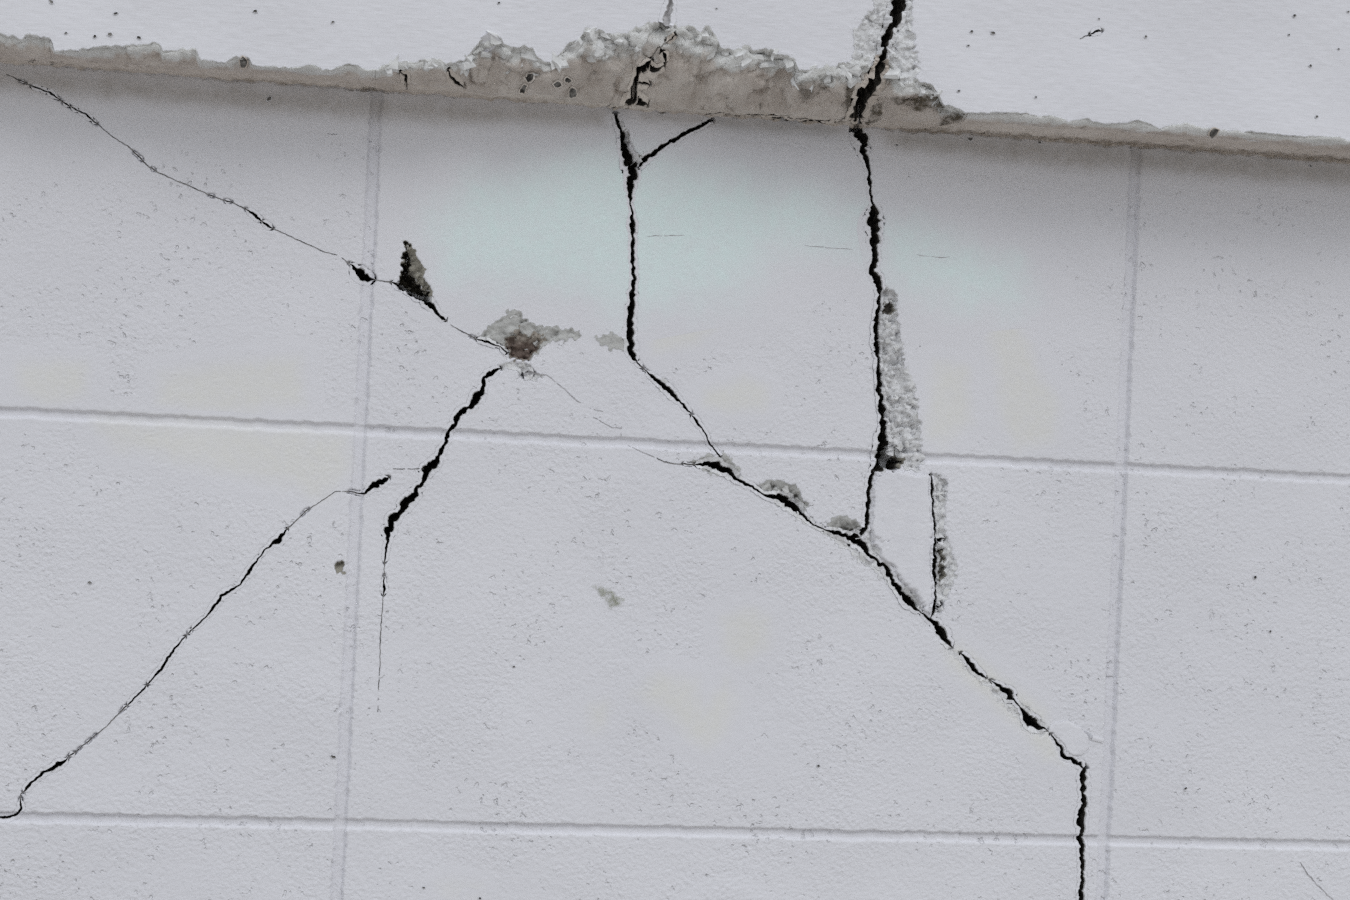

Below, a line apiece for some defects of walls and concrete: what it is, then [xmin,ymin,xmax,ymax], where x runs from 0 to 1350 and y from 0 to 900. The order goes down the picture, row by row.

crack [1080,27,1103,39]
crack [400,70,411,90]
crack [446,69,464,88]
spalling [0,0,1350,160]
flaking render [398,241,433,297]
flaking render [481,309,625,381]
crack [0,74,508,823]
crack [522,0,1092,900]
flaking render [877,286,958,614]